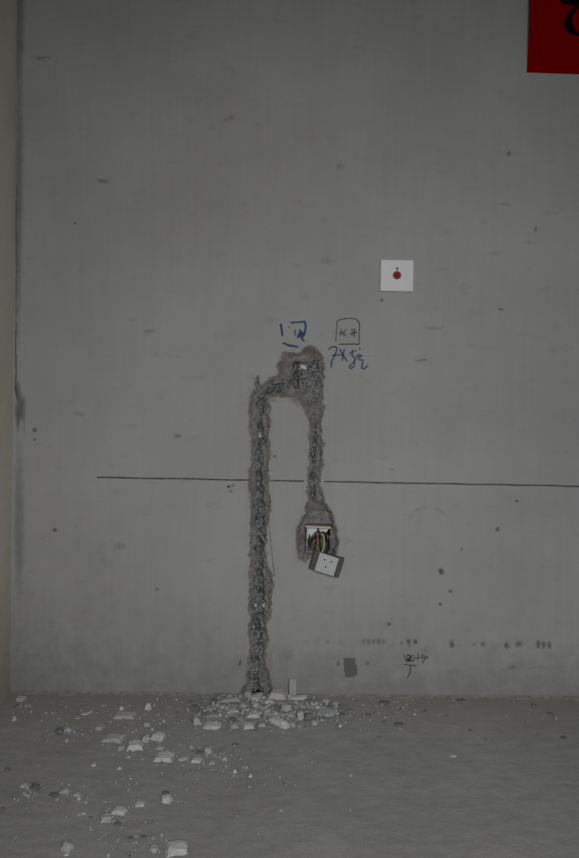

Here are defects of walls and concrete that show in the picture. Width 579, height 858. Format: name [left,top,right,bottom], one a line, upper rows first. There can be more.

spalling [240,345,340,693]